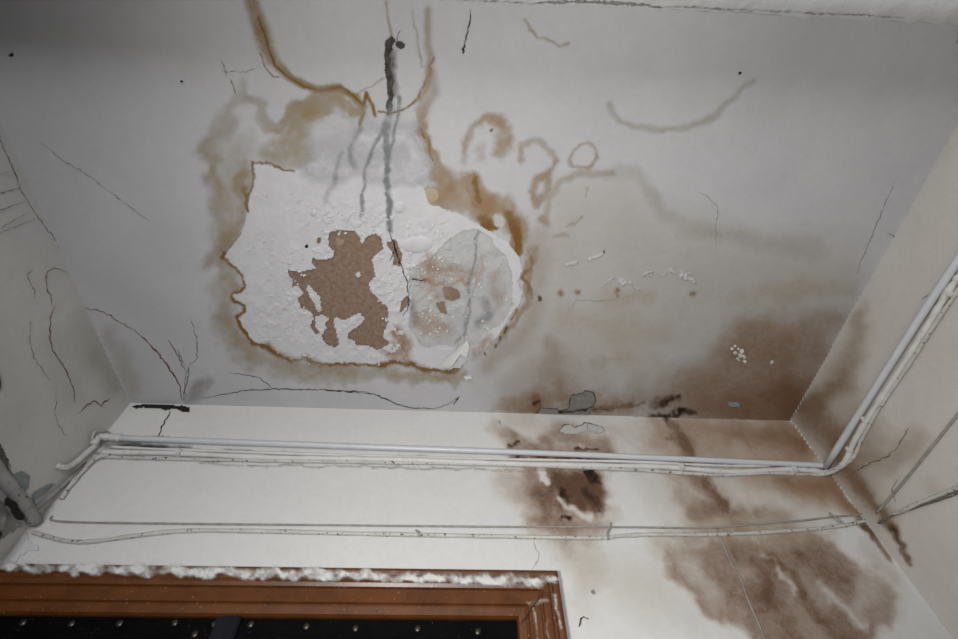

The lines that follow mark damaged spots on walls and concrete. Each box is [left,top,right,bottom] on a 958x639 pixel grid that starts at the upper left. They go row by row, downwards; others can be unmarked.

water stain [199,0,464,382]
peeling [225,125,523,380]
crack [388,228,423,315]
water stain [417,121,537,347]
water stain [474,113,512,155]
water stain [529,158,557,224]
crack [28,267,110,434]
crack [86,308,460,437]
water stain [506,383,570,414]
water stain [589,399,634,415]
water stain [505,425,622,542]
water stain [650,321,892,639]